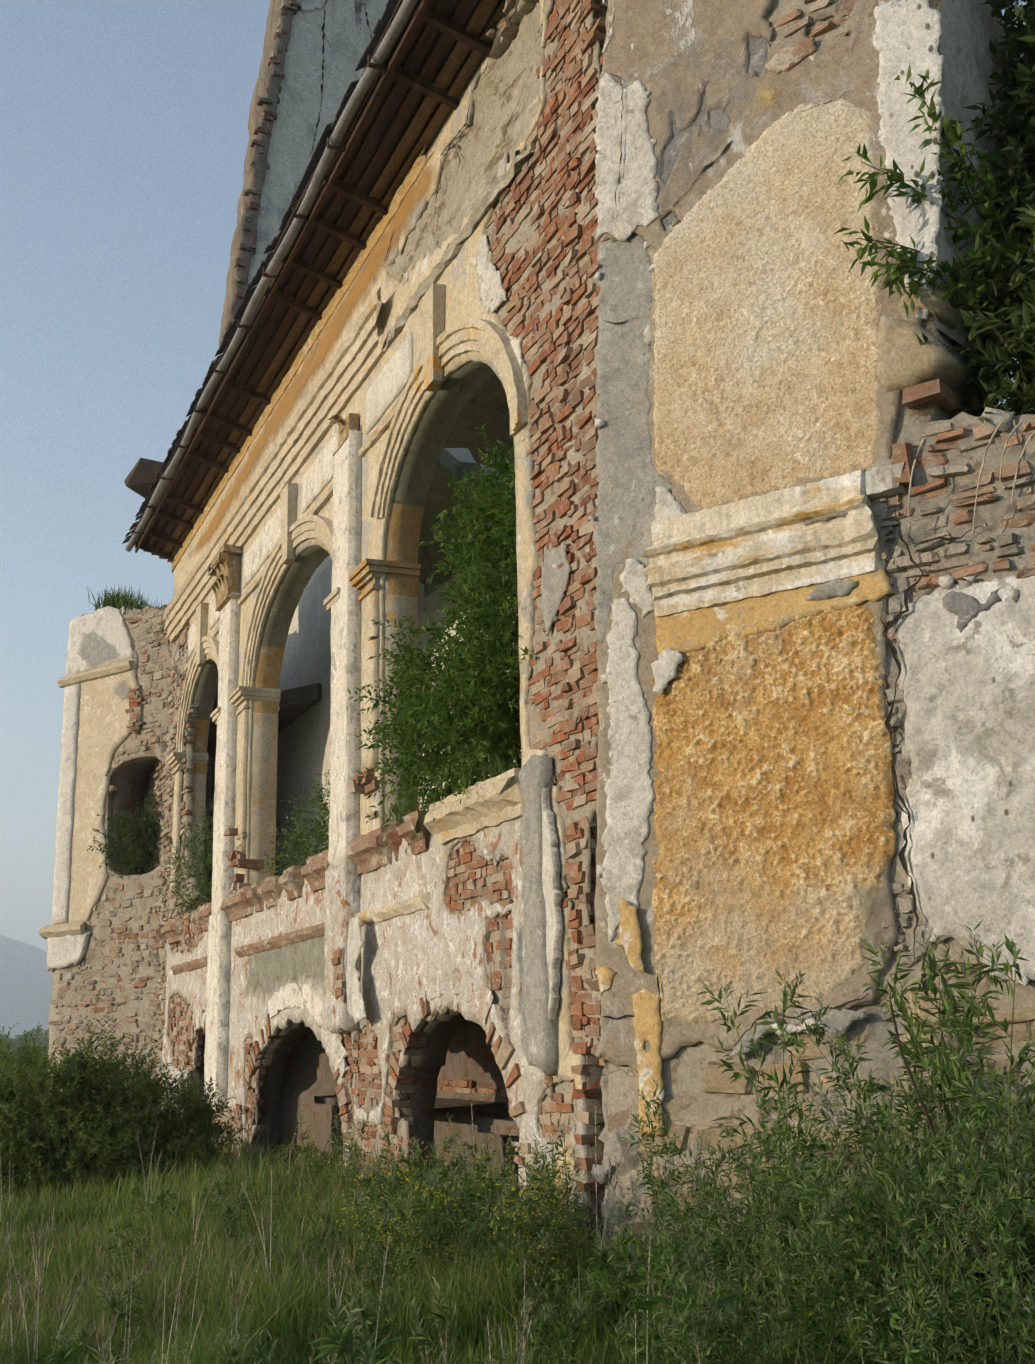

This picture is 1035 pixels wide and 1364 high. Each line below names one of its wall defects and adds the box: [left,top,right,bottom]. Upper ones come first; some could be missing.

crack [310,0,331,155]
spalling [48,602,208,1126]
flaking render [387,0,1035,1282]
crack [880,507,982,1036]